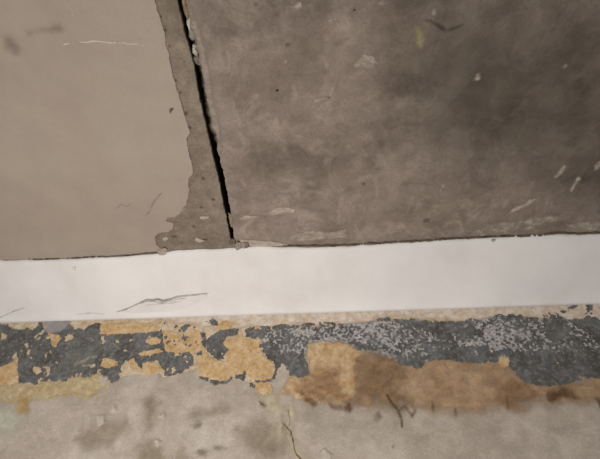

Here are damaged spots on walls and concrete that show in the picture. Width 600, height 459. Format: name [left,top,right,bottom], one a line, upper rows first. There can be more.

peeling [155,0,230,250]
crack [179,0,234,239]
peeling [0,293,600,398]